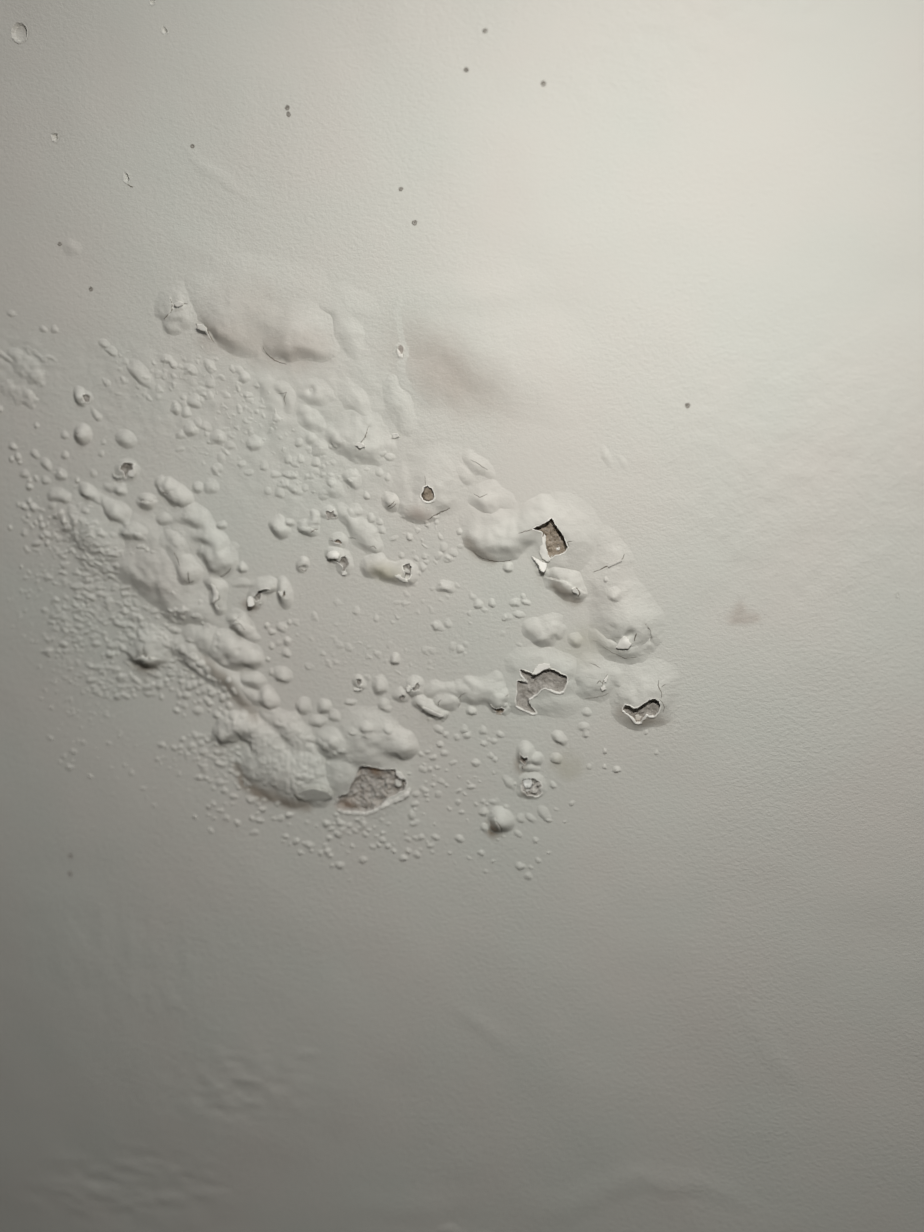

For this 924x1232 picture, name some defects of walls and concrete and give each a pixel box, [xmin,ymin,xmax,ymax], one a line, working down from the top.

peeling [459,491,602,572]
peeling [504,645,584,718]
peeling [609,658,681,731]
peeling [314,705,420,820]